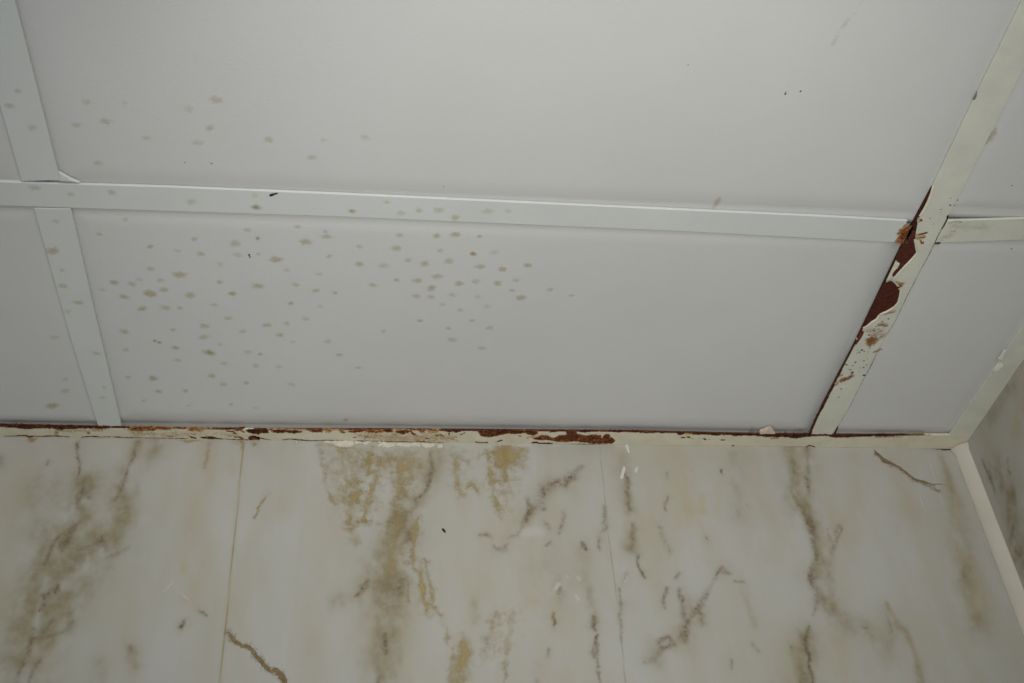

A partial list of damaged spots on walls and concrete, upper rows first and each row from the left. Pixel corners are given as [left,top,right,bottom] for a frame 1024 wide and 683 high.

rust [895,224,913,244]
peeling [855,185,935,345]
rust [0,312,925,447]
damp [348,455,421,523]
damp [488,446,524,484]
crack [874,450,944,492]
crack [227,632,287,683]